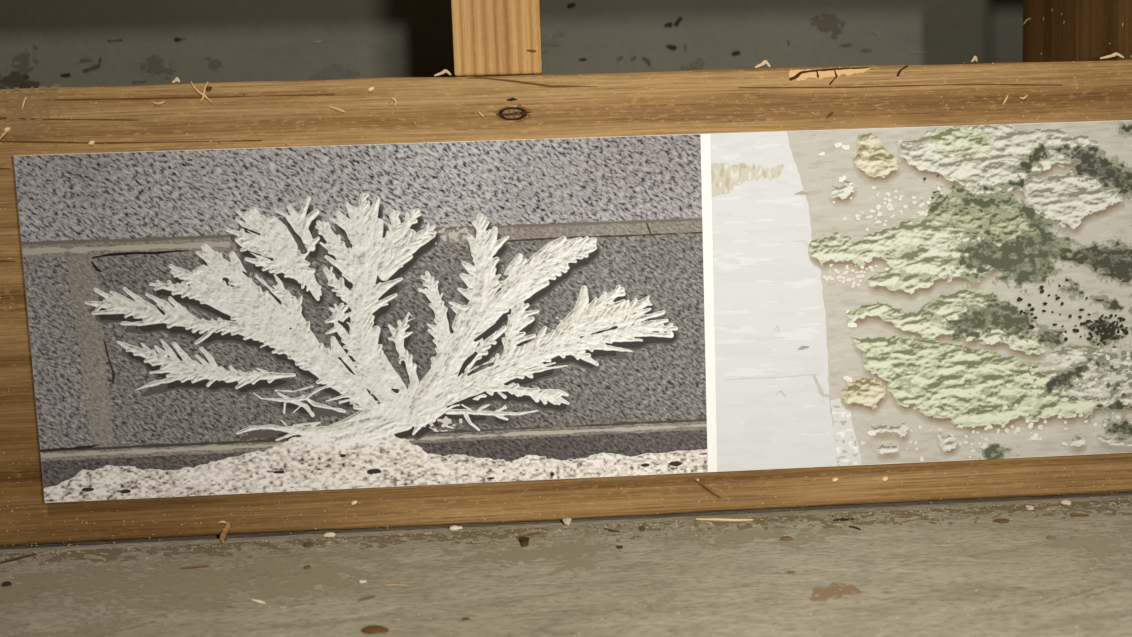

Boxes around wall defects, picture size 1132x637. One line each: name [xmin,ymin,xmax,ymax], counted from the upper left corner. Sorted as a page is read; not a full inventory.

water stain [85,193,678,447]
peeling [711,121,1132,471]
water stain [808,124,1132,454]